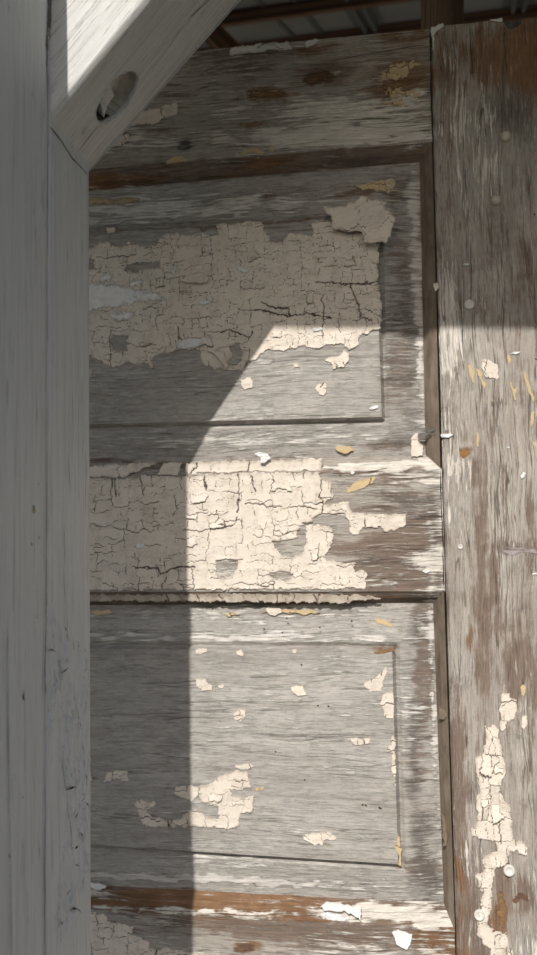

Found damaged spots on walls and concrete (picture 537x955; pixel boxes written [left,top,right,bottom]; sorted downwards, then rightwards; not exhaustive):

crack [342,39,433,139]
peeling [89,179,396,390]
peeling [315,382,327,395]
peeling [89,458,407,617]
crack [438,471,446,584]
peeling [132,763,264,830]
peeling [471,685,528,955]
peeling [91,912,213,955]
peeling [320,901,362,921]
peeling [392,929,412,950]